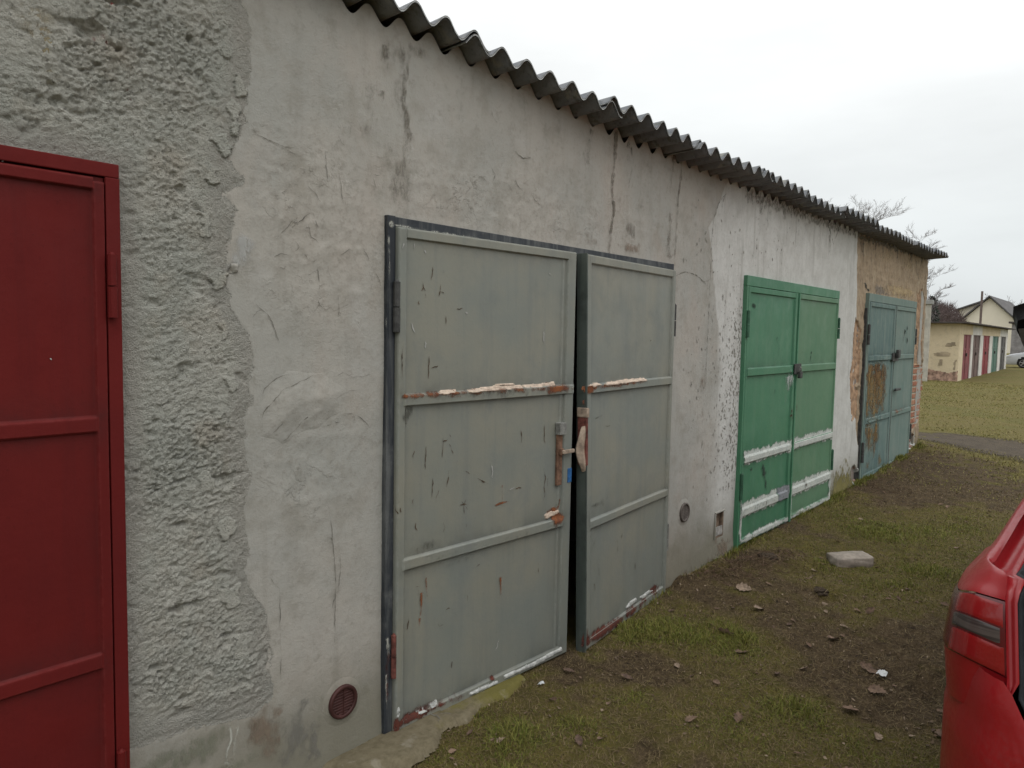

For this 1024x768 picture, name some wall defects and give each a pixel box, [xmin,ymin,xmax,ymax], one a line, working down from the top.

crack [254,140,344,343]
spalling [0,0,274,751]
spalling [850,318,862,422]